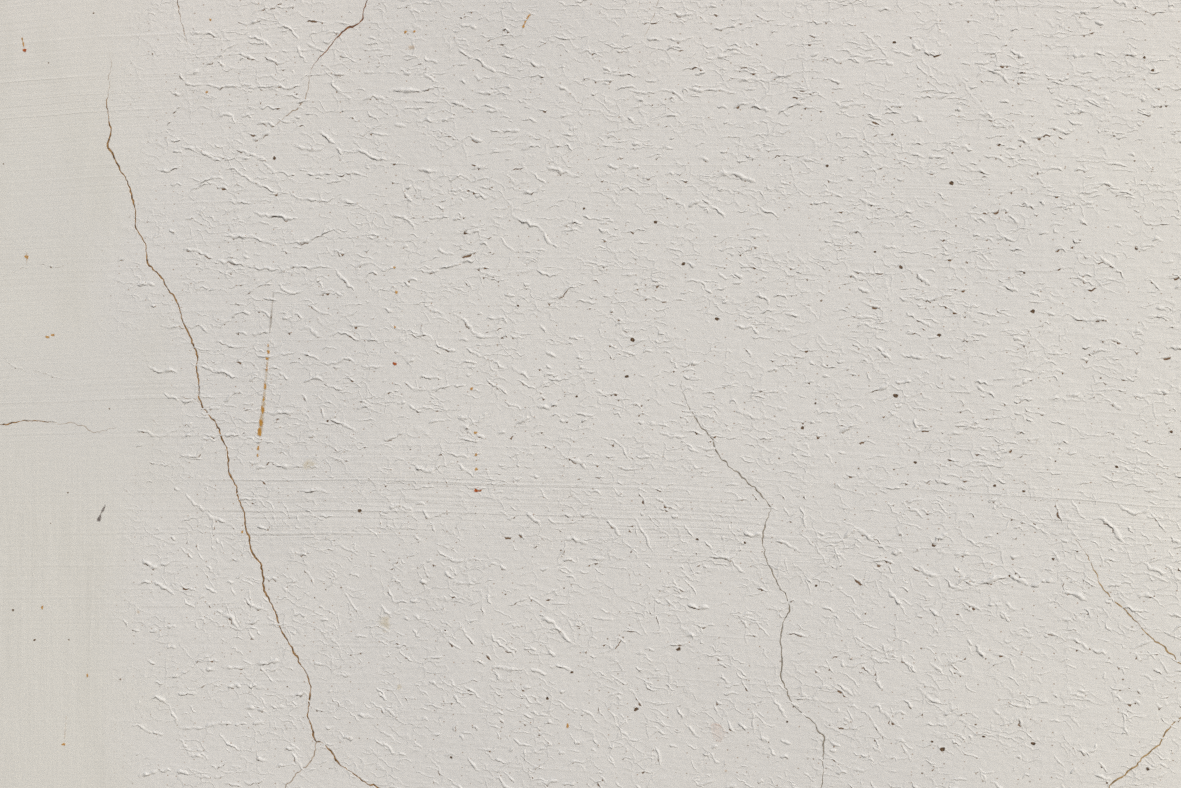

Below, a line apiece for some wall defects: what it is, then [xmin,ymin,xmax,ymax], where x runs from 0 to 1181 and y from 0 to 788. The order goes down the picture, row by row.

crack [276,0,369,125]
crack [0,419,114,433]
crack [105,61,383,788]
crack [680,380,827,788]
crack [1077,541,1181,664]
crack [1107,716,1181,788]